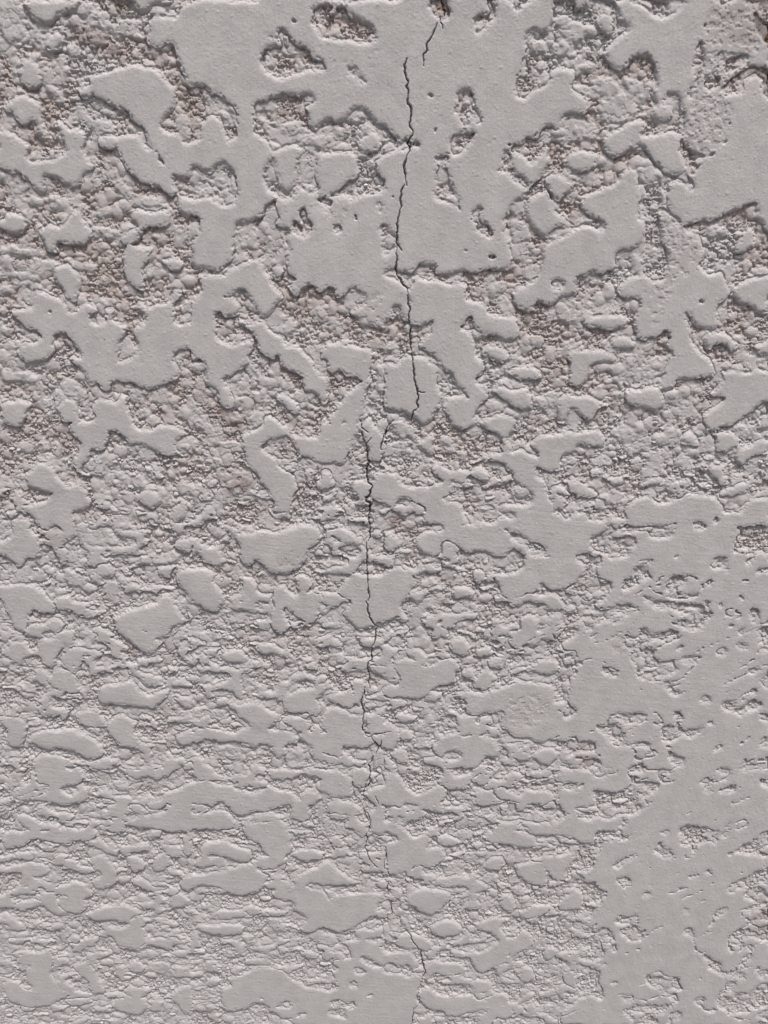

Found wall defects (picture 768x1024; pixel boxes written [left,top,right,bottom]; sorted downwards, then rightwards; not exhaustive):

crack [360,1,446,1022]